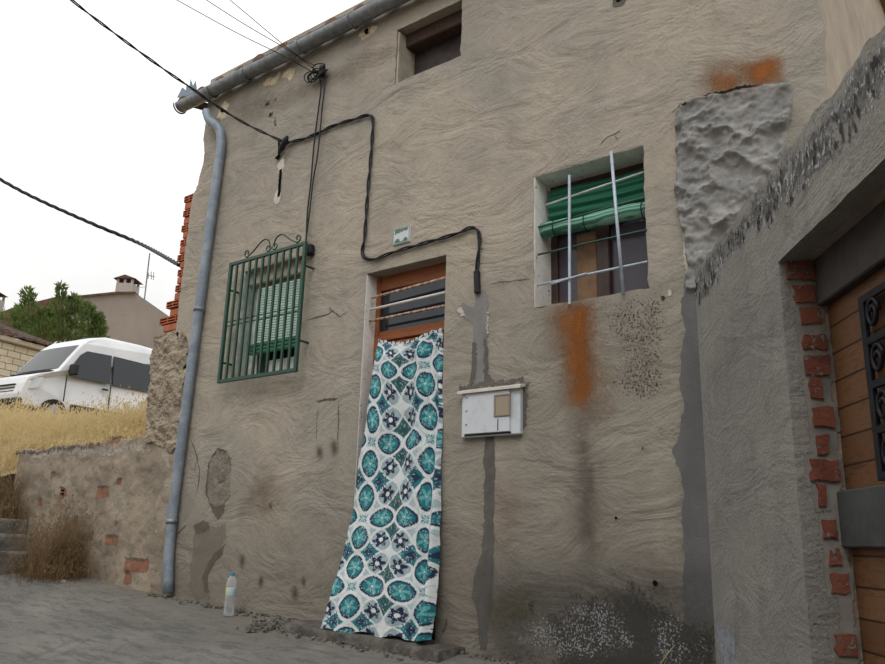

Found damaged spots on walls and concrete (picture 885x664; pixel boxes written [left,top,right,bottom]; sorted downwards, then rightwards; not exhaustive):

corrosion [709,59,778,89]
peeling [685,39,885,305]
corrosion [561,307,595,410]
water stain [597,299,664,399]
spalling [123,556,150,585]
peeling [190,448,231,598]
water stain [502,584,738,664]